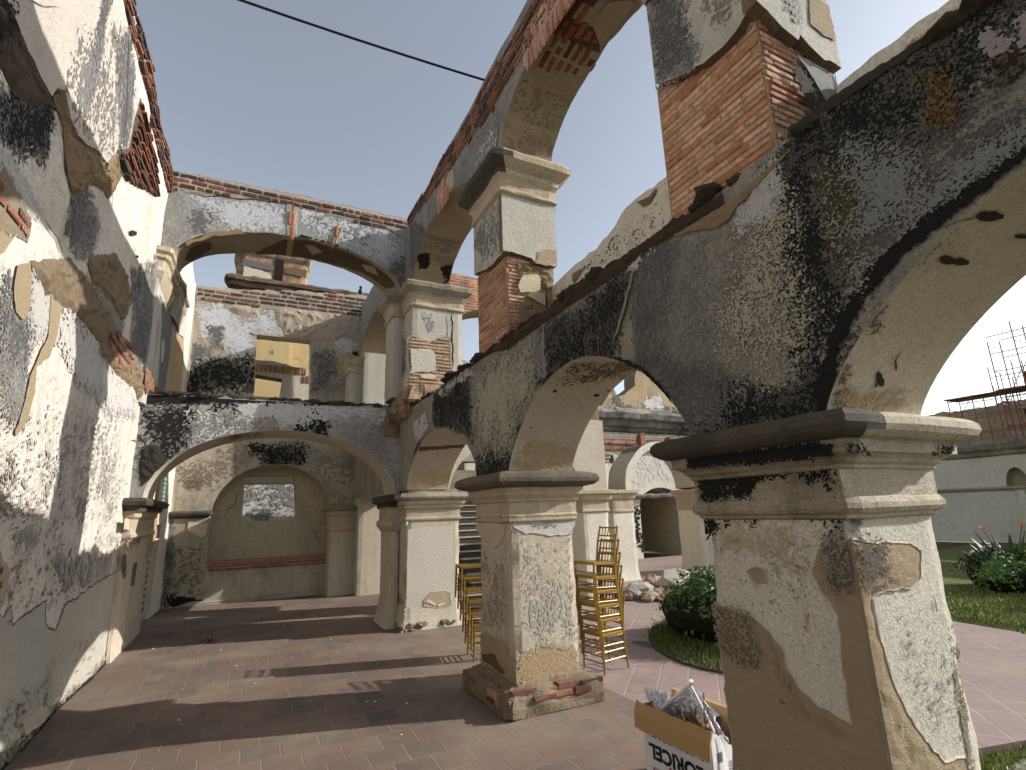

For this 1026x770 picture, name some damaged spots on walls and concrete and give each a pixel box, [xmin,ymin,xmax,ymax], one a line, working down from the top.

flaking render [0,162,32,256]
damp [0,0,138,223]
flaking render [109,330,135,376]
damp [0,182,460,623]
flaking render [118,0,600,289]
flaking render [405,333,453,389]
flaking render [477,20,928,353]
damp [532,0,1026,486]
flaking render [809,0,836,40]
flaking render [481,653,505,674]
flaking render [716,537,969,770]